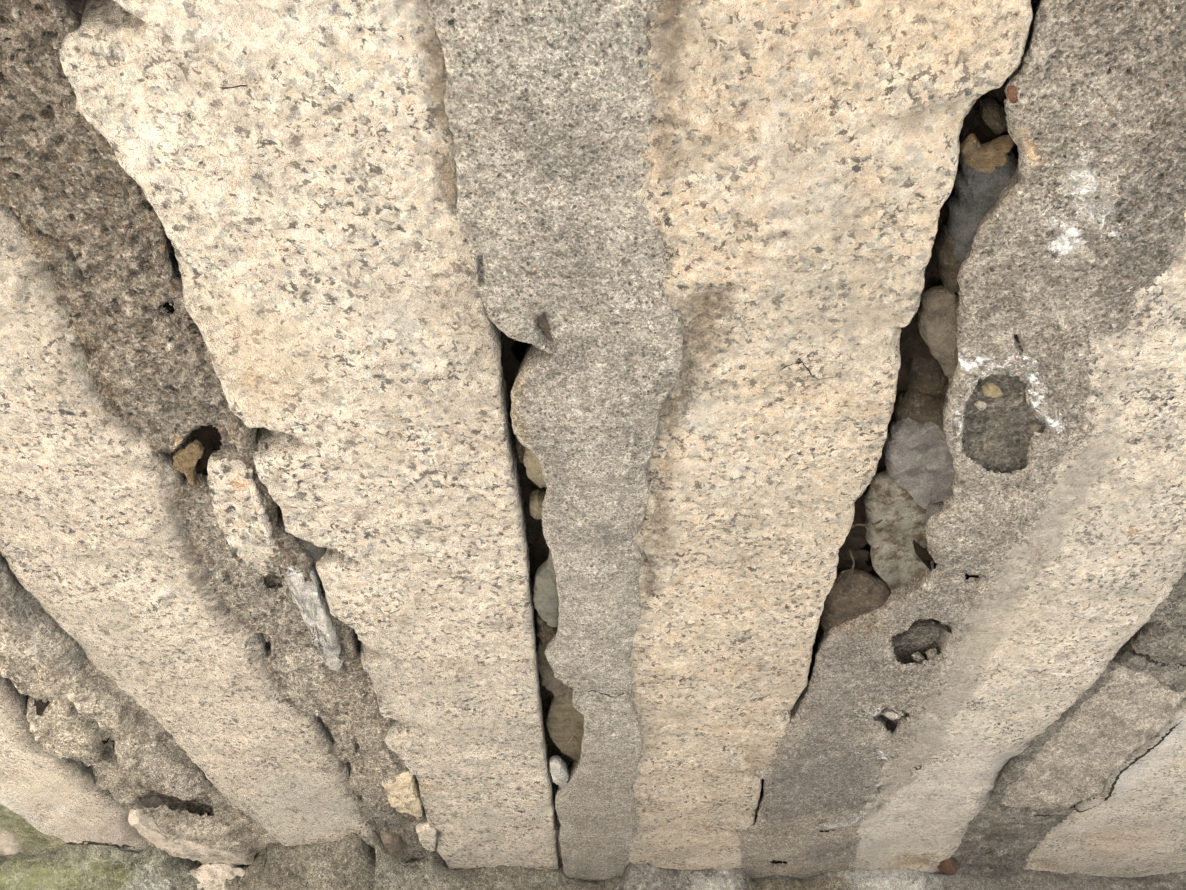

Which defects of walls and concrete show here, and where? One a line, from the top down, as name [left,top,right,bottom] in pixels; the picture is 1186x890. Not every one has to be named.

water stain [1051,220,1079,255]
crack [837,84,1005,575]
spalling [954,374,1046,474]
crack [500,330,563,760]
crack [808,621,823,678]
spalling [891,618,952,664]
crack [1125,641,1186,669]
crack [34,699,51,716]
crack [1033,721,1182,817]